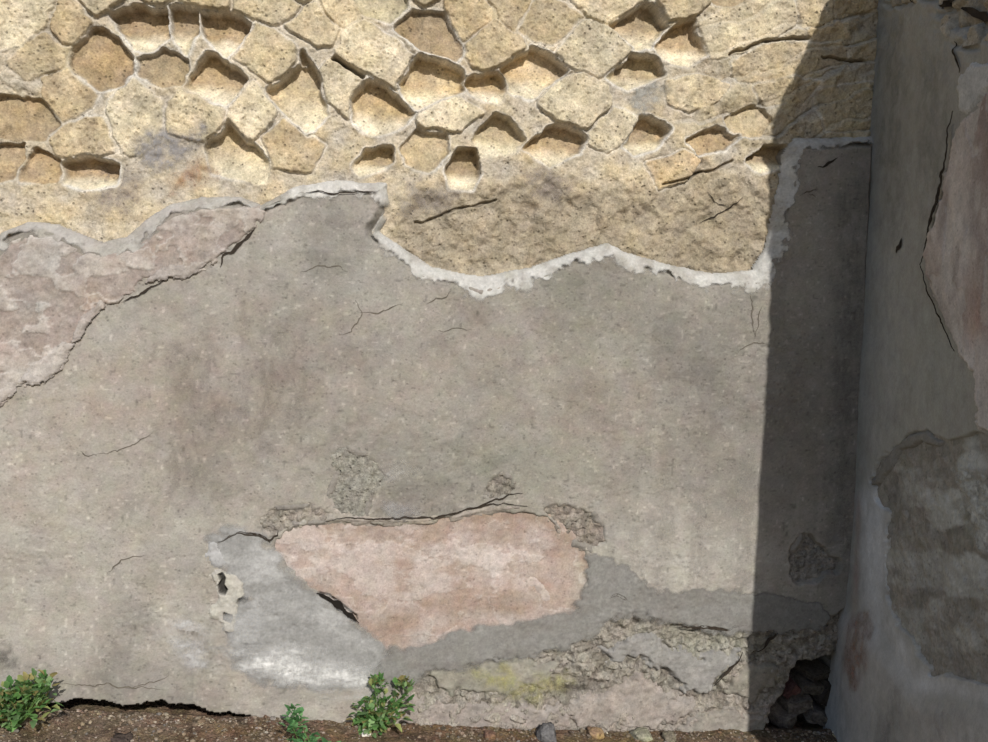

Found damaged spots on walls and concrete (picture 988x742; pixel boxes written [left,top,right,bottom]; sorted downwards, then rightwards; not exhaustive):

peeling [0,205,266,407]
spalling [871,62,988,684]
peeling [205,541,244,635]
crack [317,593,359,623]
crack [330,493,522,521]
spalling [260,445,606,652]
spalling [788,533,838,582]
crack [55,678,165,690]
spalling [399,610,841,733]